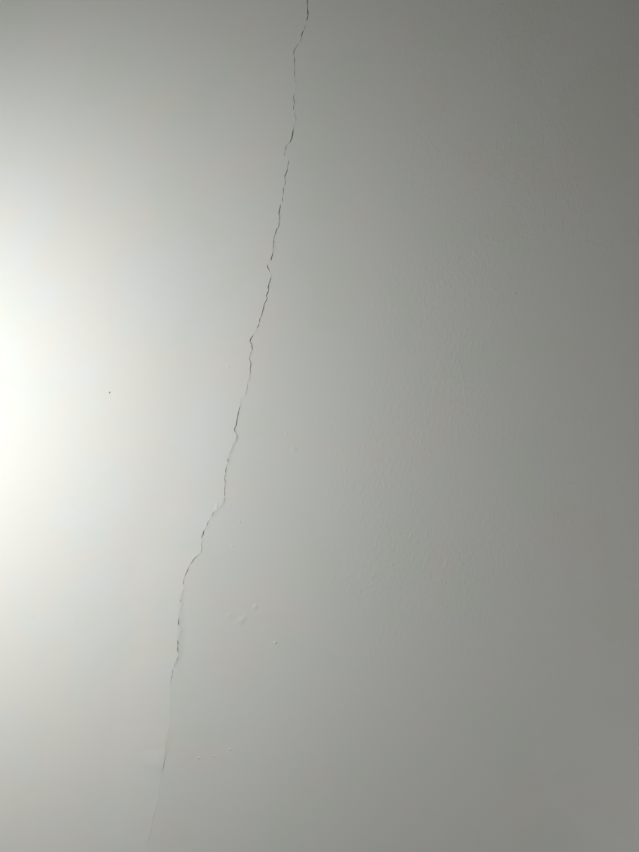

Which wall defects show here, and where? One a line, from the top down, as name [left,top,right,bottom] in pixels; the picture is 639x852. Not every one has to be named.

crack [170,97,296,700]